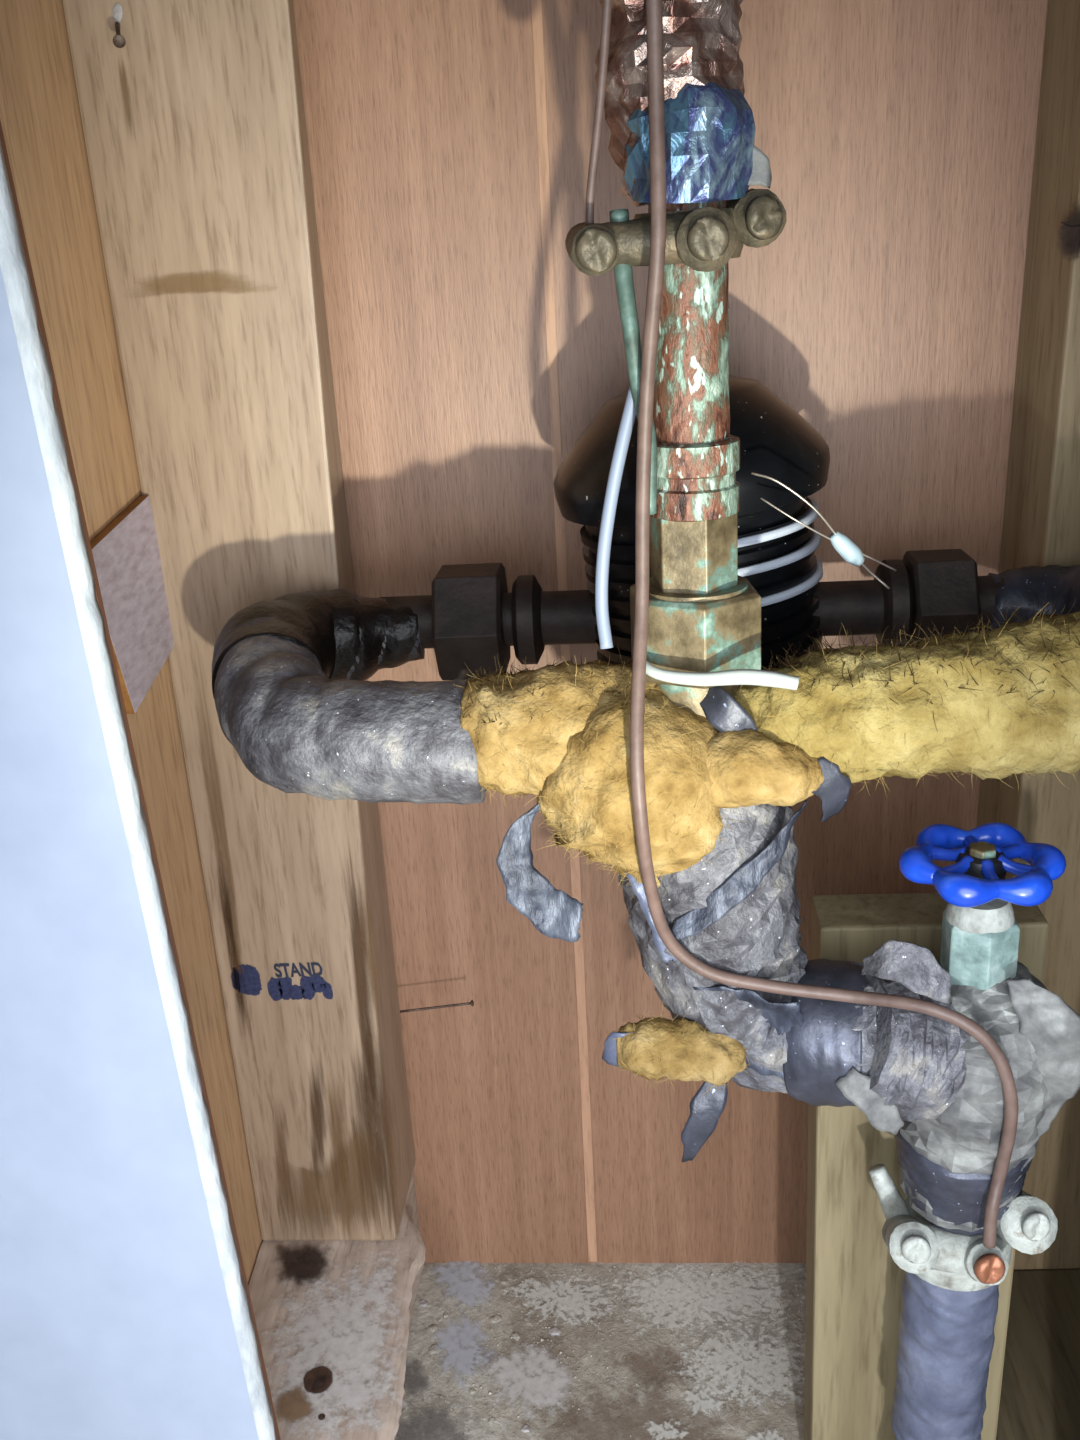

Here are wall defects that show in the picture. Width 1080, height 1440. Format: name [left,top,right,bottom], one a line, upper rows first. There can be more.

damp [278,897,395,1224]
damp [277,1245,327,1284]
damp [278,1390,312,1422]